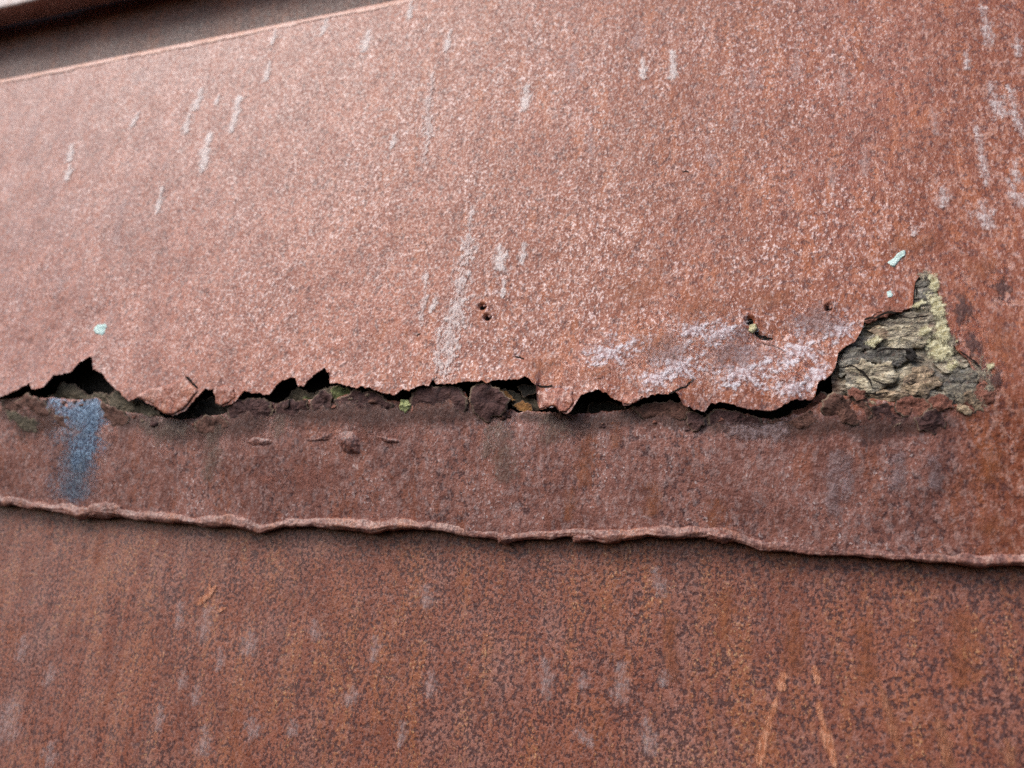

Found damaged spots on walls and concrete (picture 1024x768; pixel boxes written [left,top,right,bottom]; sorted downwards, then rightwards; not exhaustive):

efflorescence [584,311,854,396]
spalling [831,271,996,416]